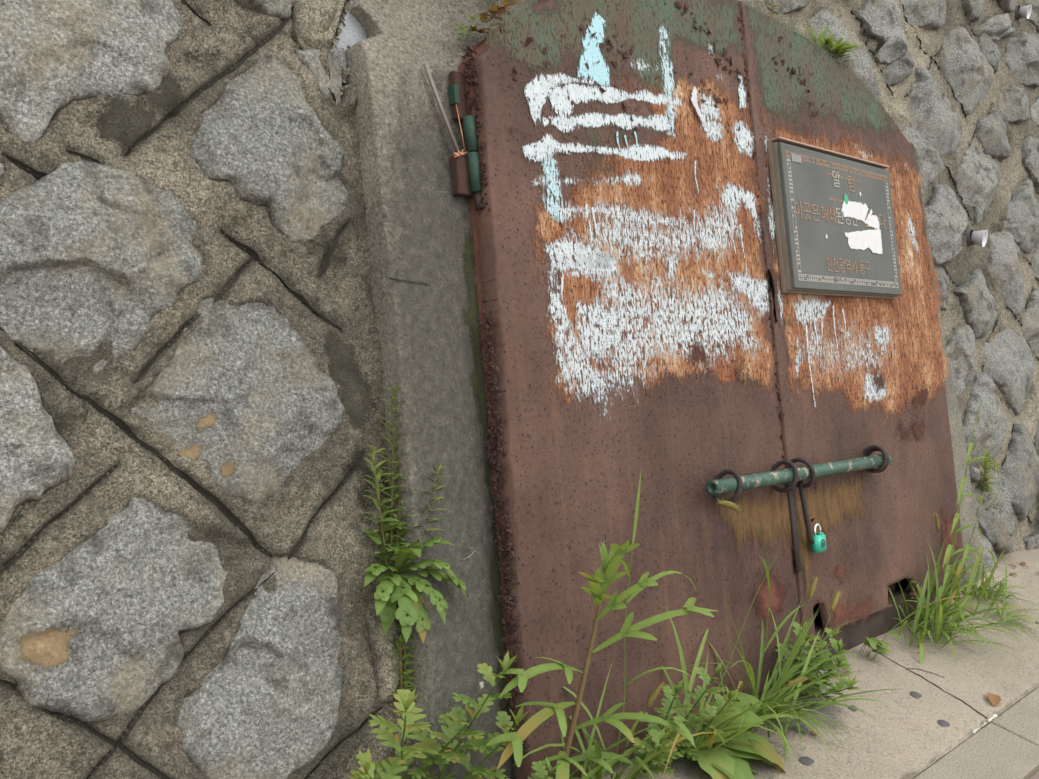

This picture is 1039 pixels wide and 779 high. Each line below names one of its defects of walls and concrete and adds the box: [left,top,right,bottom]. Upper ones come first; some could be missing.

corrosion [462,45,491,215]
peeling [581,129,632,173]
peeling [486,0,899,145]
corrosion [528,2,949,466]
corrosion [477,310,525,732]
corrosion [720,477,863,595]
crack [869,646,988,719]